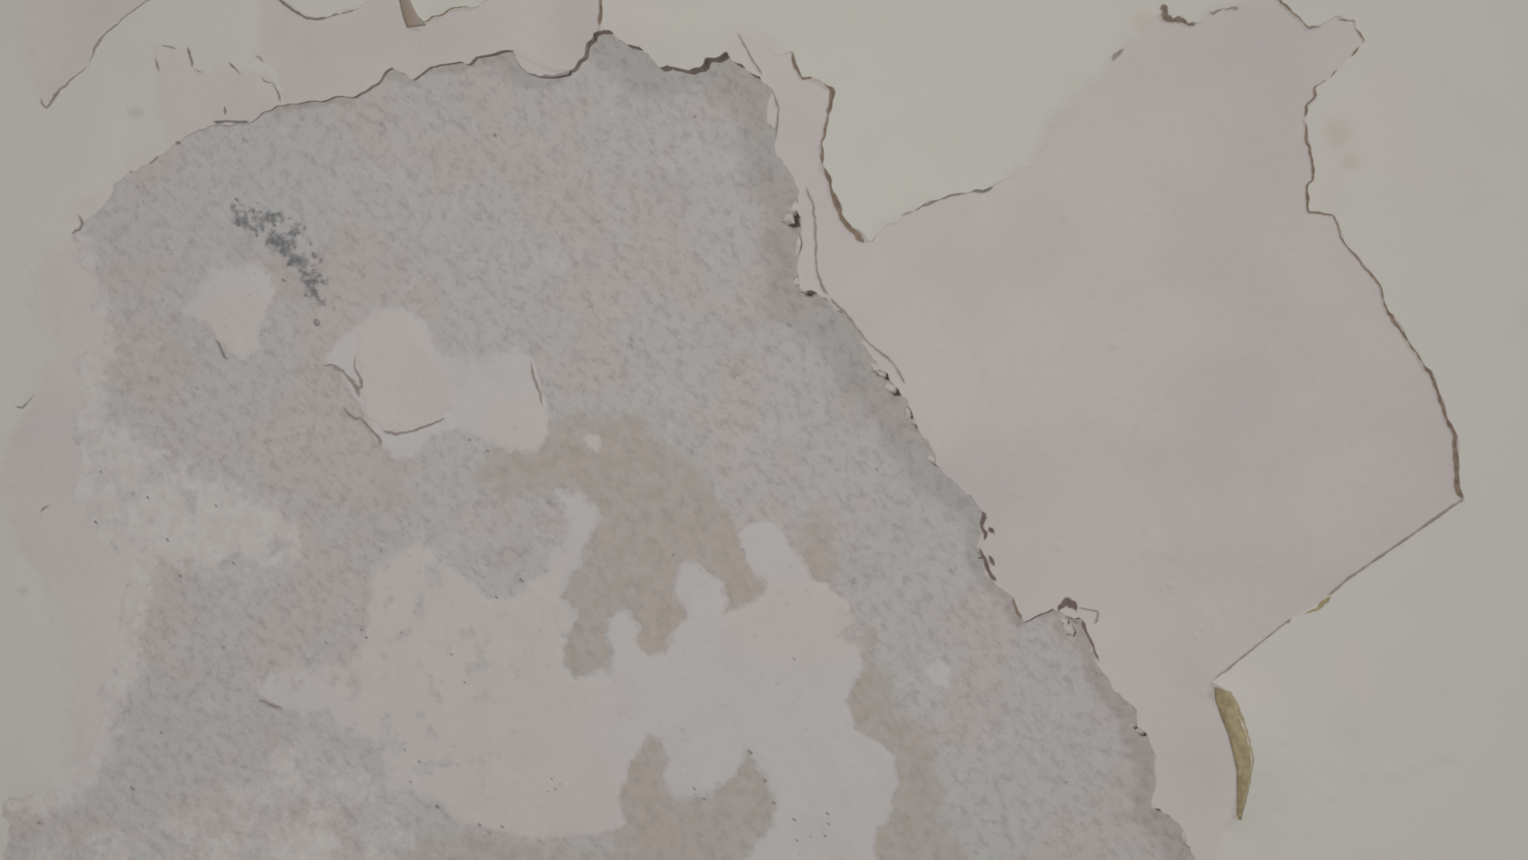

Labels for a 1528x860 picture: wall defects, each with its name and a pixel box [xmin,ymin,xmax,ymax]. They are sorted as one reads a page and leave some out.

crack [41,0,148,108]
crack [279,0,353,20]
crack [596,0,604,24]
crack [1160,4,1238,26]
crack [1216,0,1463,678]
spalling [83,0,1196,860]
peeling [720,0,1465,860]